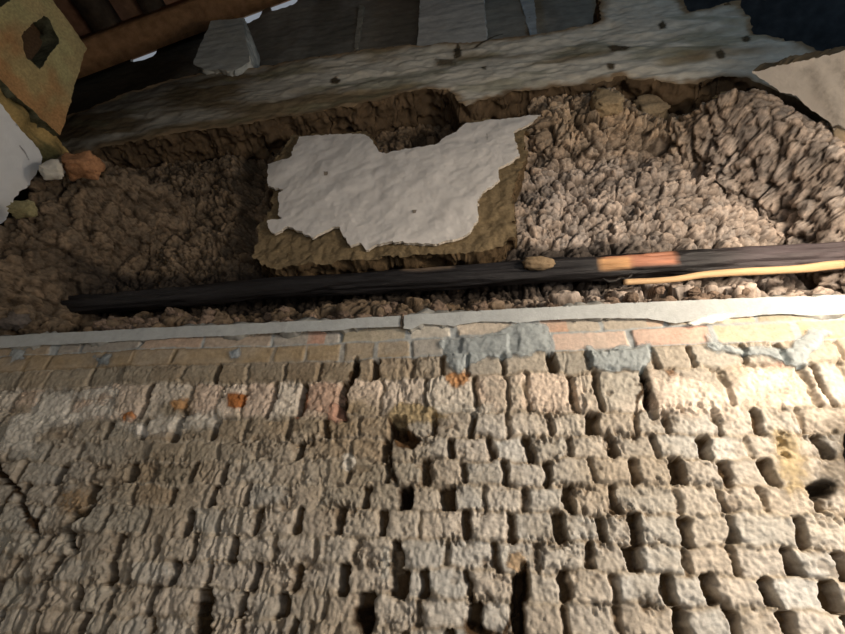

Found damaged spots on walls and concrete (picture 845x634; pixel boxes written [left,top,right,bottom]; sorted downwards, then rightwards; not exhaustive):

spalling [589,87,671,121]
spalling [61,150,106,182]
spalling [6,200,38,219]
crack [0,464,40,530]